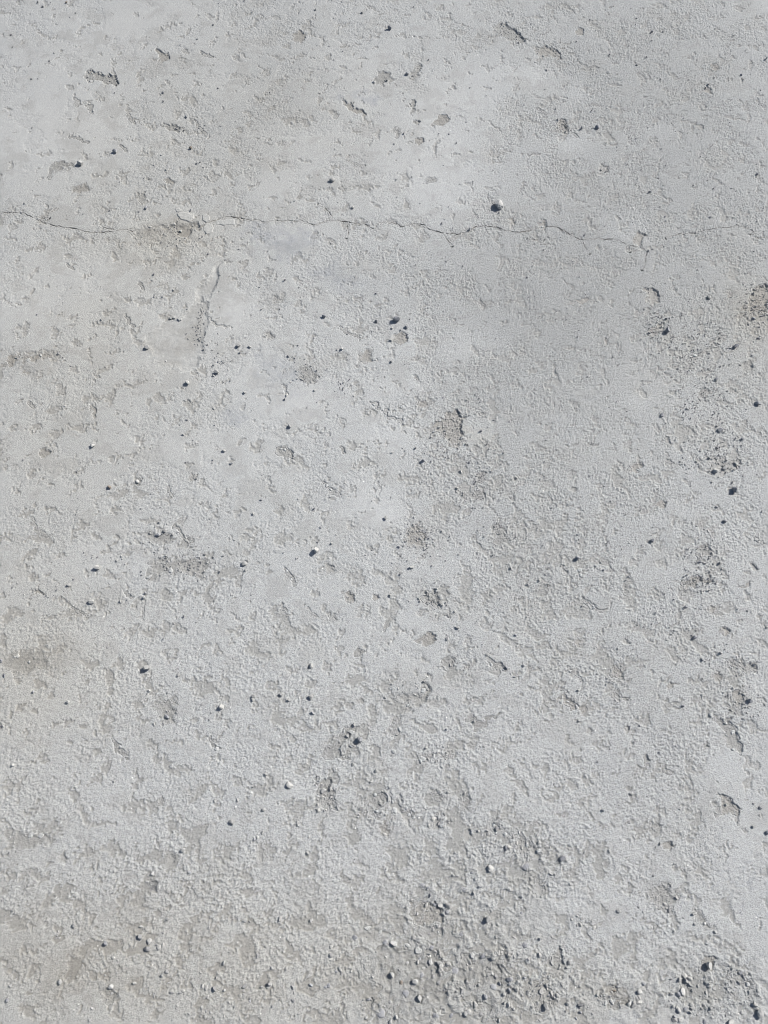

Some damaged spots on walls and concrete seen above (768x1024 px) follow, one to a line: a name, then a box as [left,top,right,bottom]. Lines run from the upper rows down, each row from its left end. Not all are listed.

crack [0,204,768,270]